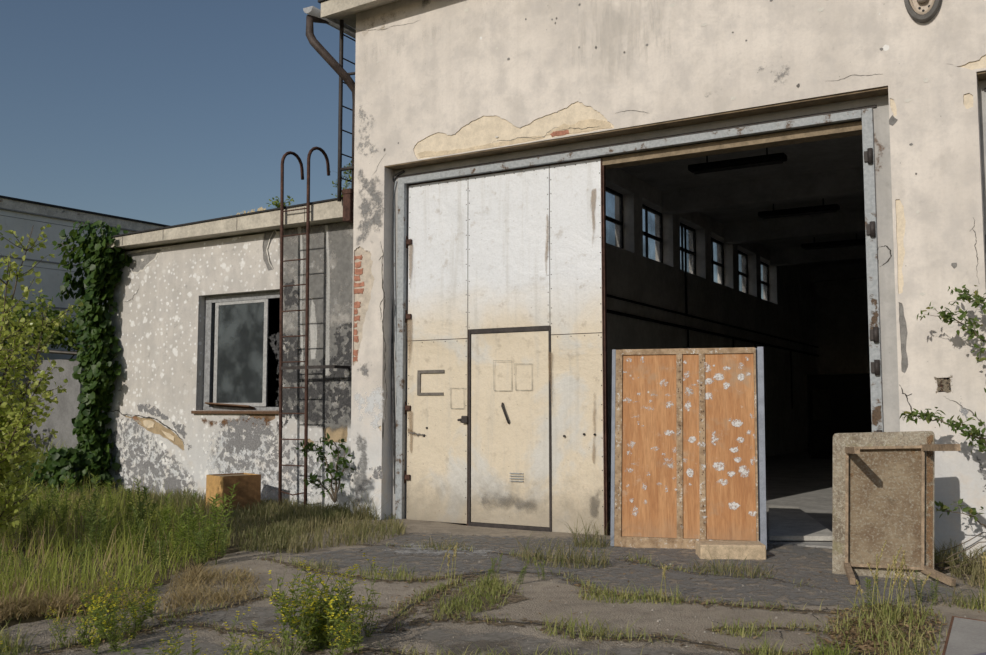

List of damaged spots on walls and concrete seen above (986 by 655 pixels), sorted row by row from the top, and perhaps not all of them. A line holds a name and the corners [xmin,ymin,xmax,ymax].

peeling [959,55,986,70]
peeling [414,102,614,159]
spalling [353,247,375,365]
peeling [110,404,196,494]
peeling [215,414,348,493]